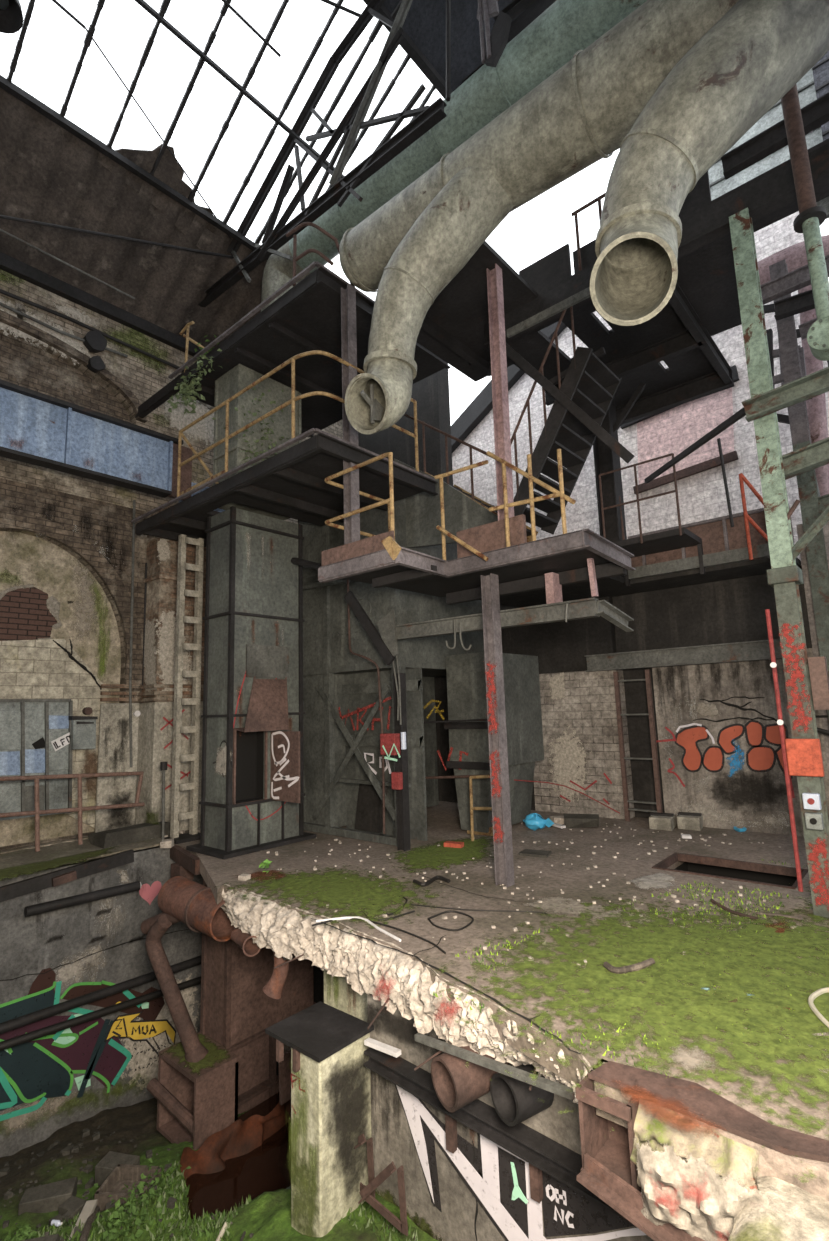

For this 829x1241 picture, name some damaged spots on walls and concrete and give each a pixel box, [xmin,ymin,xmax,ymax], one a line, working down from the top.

flaking render [0,584,73,641]
crack [52,639,102,690]
spalling [221,873,593,1104]
leakage [289,1101,316,1193]
corrosion [623,1087,715,1134]
spalling [634,1137,769,1241]